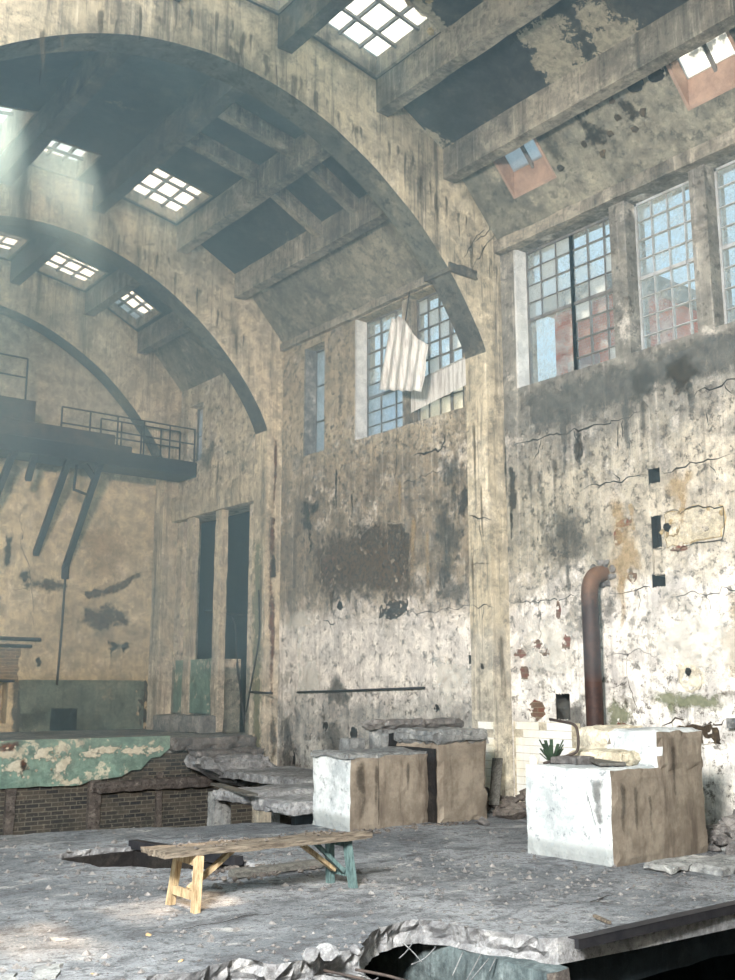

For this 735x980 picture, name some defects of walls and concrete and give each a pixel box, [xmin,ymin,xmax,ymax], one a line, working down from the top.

peeling [514,0,644,84]
damp [528,333,735,469]
crack [694,378,735,426]
crack [514,412,637,459]
crack [584,474,639,489]
crack [662,454,729,474]
spalling [651,514,692,552]
damp [301,495,416,614]
crack [676,586,735,613]
flaking render [527,693,570,722]
peeling [0,744,164,786]
spalling [399,941,436,965]